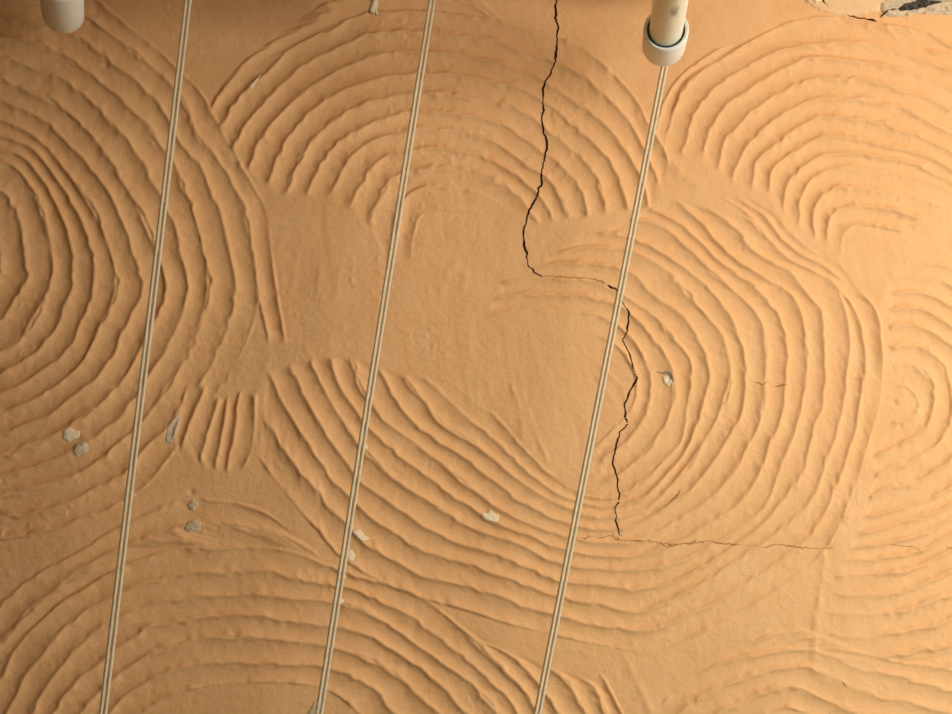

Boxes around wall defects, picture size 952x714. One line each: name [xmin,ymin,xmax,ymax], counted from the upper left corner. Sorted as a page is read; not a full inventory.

crack [522,0,833,549]
flaking render [805,0,952,22]